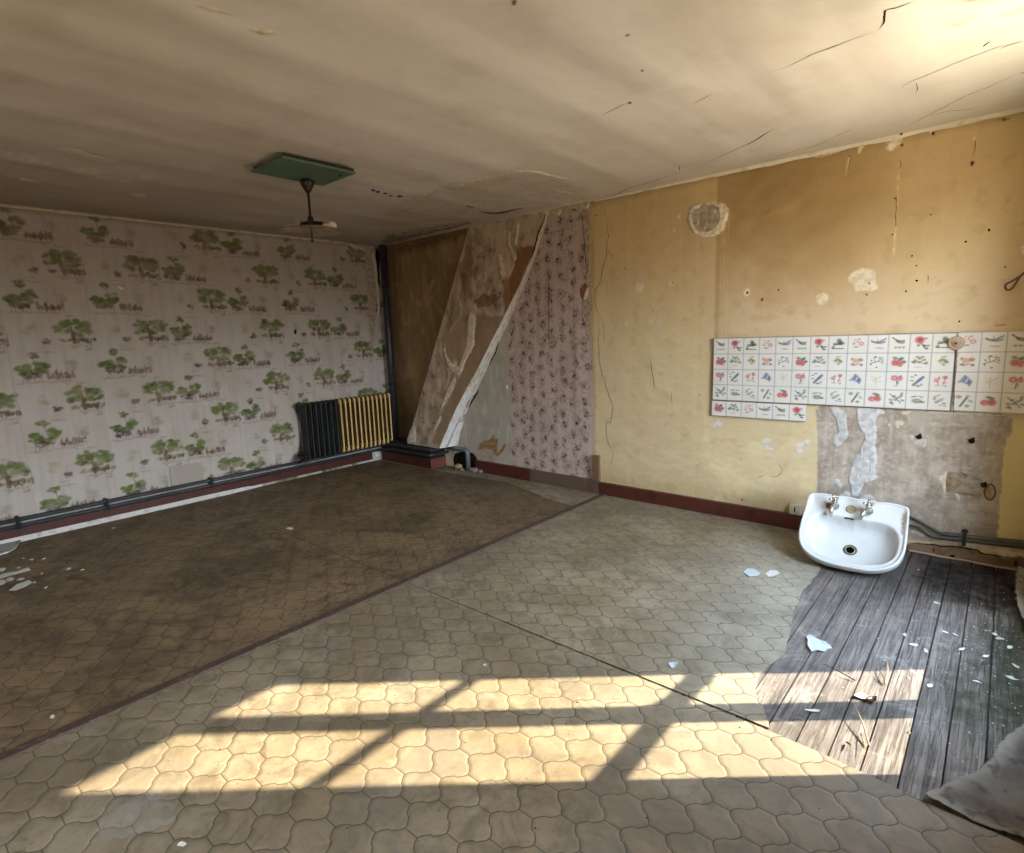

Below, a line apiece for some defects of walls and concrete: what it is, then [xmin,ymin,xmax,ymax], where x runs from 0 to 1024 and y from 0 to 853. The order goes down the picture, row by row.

crack [897,41,1022,92]
crack [593,129,851,471]
peeling [846,267,880,293]
spalling [939,471,996,501]